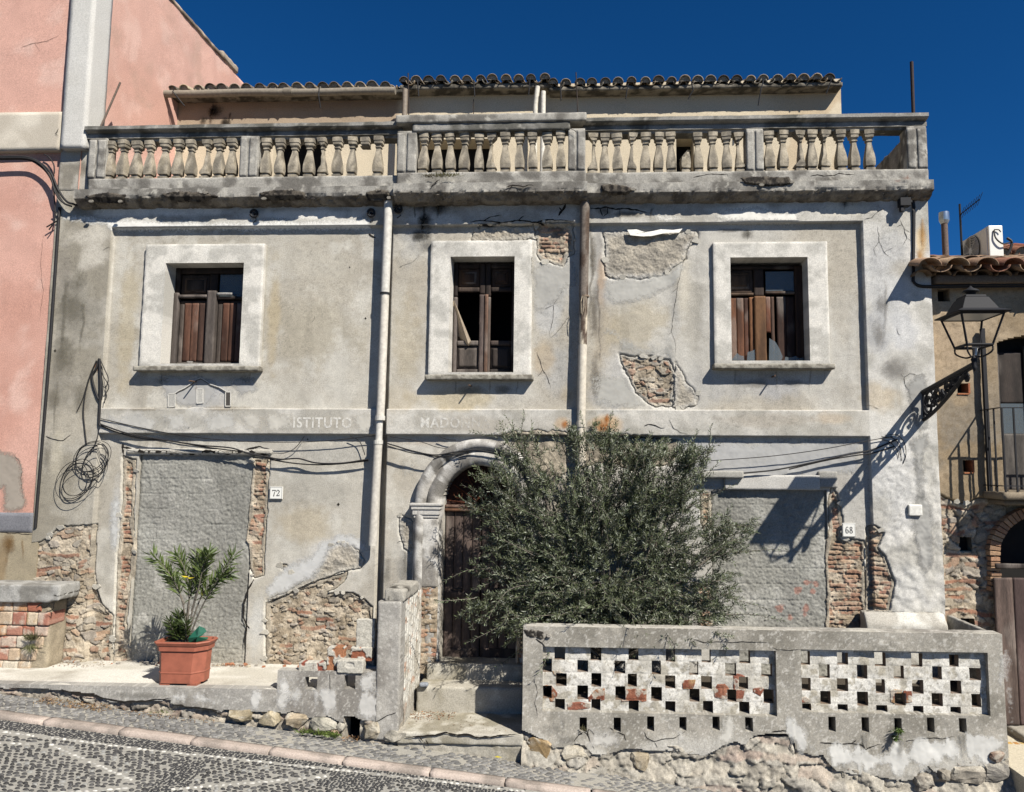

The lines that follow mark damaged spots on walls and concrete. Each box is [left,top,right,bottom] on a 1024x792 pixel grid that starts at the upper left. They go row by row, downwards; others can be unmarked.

crack [472,204,568,227]
flaking render [471,220,576,310]
flaking render [601,214,699,303]
peeling [717,207,799,225]
flaking render [620,354,701,410]
flaking render [0,451,26,512]
flaking render [33,456,139,662]
flaking render [246,457,377,674]
flaking render [824,488,894,628]